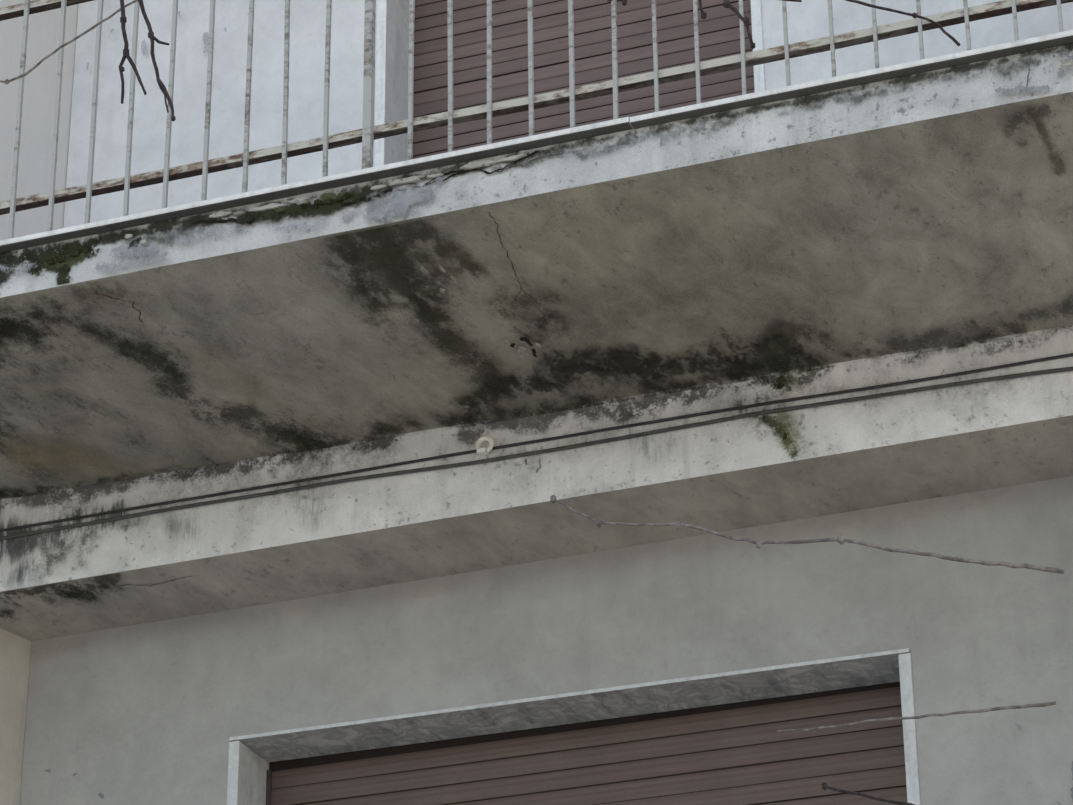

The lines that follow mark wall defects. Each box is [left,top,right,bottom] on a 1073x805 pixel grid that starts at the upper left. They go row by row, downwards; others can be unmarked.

leakage [1006,106,1065,175]
leakage [0,219,216,284]
crack [489,213,545,318]
leakage [327,223,830,444]
leakage [845,301,1073,362]
leakage [0,324,421,616]